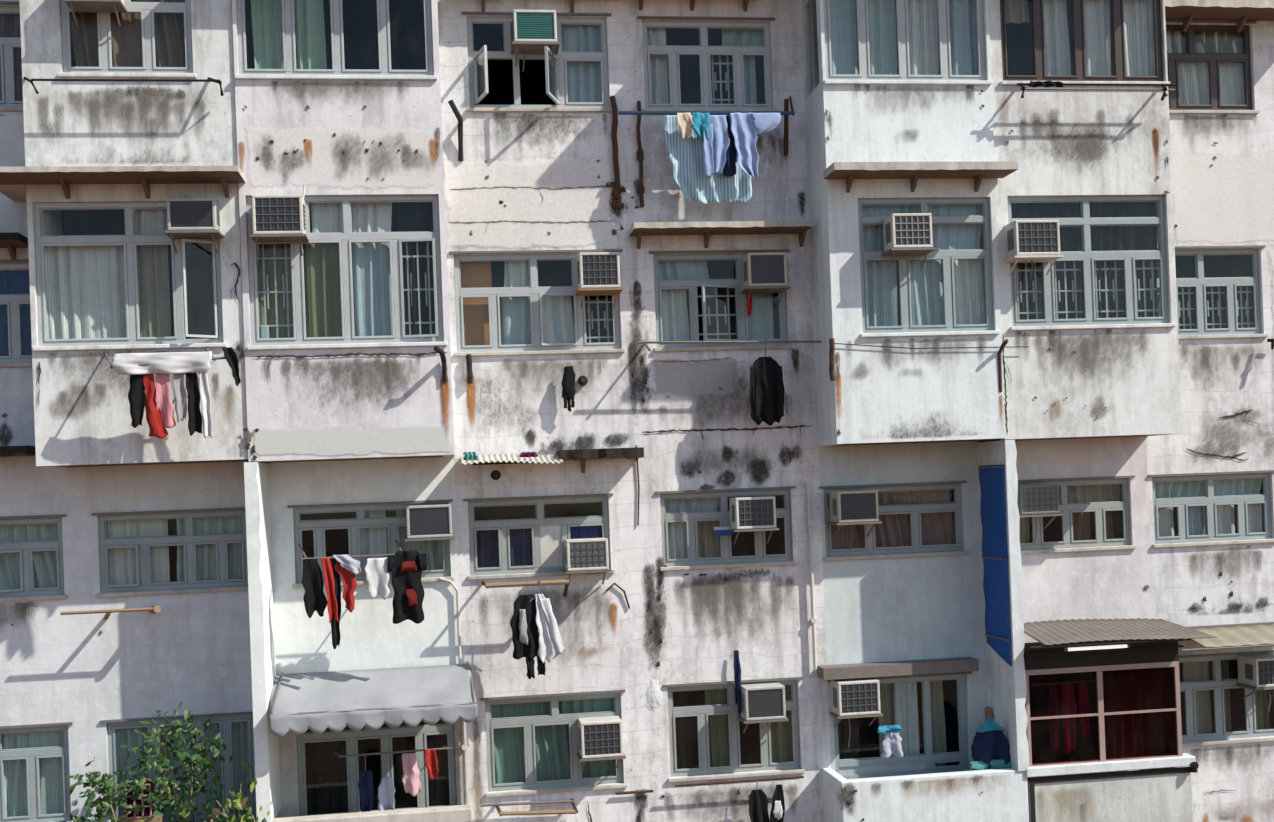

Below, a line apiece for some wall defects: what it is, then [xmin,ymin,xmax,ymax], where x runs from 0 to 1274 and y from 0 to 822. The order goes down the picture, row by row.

damp [39,86,205,163]
damp [1002,103,1107,166]
damp [1017,329,1146,373]
damp [50,352,127,415]
rust [440,367,450,422]
rust [466,376,475,419]
damp [0,424,12,445]
crack [1186,410,1258,465]
rust [609,603,617,628]
damp [644,558,792,670]
damp [635,790,647,822]